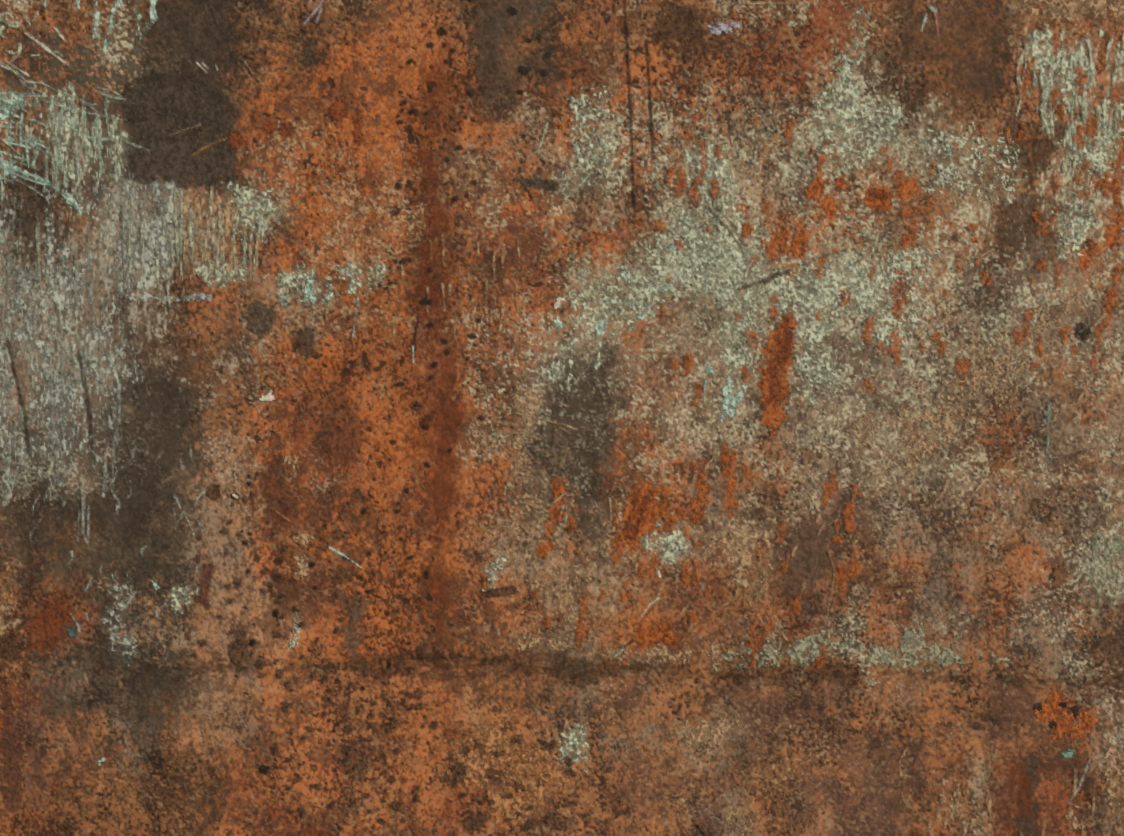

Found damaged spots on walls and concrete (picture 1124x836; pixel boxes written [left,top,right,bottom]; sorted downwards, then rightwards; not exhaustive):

peeling [546,137,935,421]
corrosion [654,114,839,279]
peeling [811,44,906,170]
corrosion [805,141,935,365]
peeling [917,122,1020,215]
peeling [1023,0,1124,129]
peeling [1052,94,1124,258]
corrosion [1074,53,1124,270]
corrosion [671,352,704,405]
corrosion [738,296,804,442]
corrosion [610,442,758,564]
spalling [221,519,317,740]